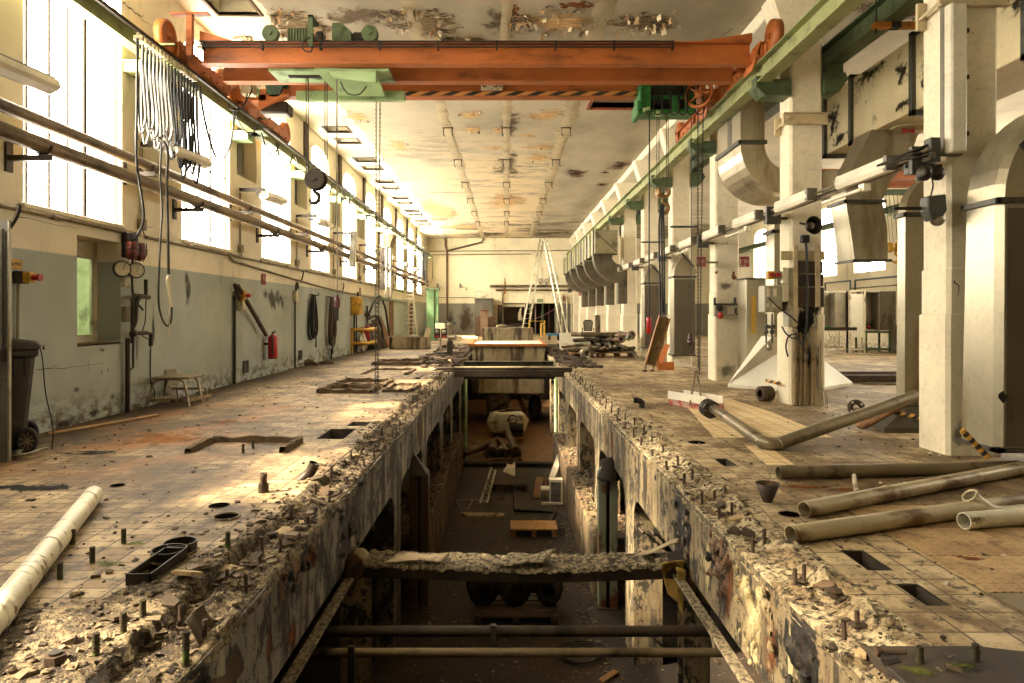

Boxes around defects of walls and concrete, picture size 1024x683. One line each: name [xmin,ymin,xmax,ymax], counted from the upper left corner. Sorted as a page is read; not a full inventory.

peeling [380,8,484,40]
peeling [507,9,681,40]
leakage [855,60,907,85]
leakage [828,101,847,147]
leakage [797,307,820,368]
spalling [182,352,472,683]
spalling [545,353,865,683]
leakage [701,541,711,593]